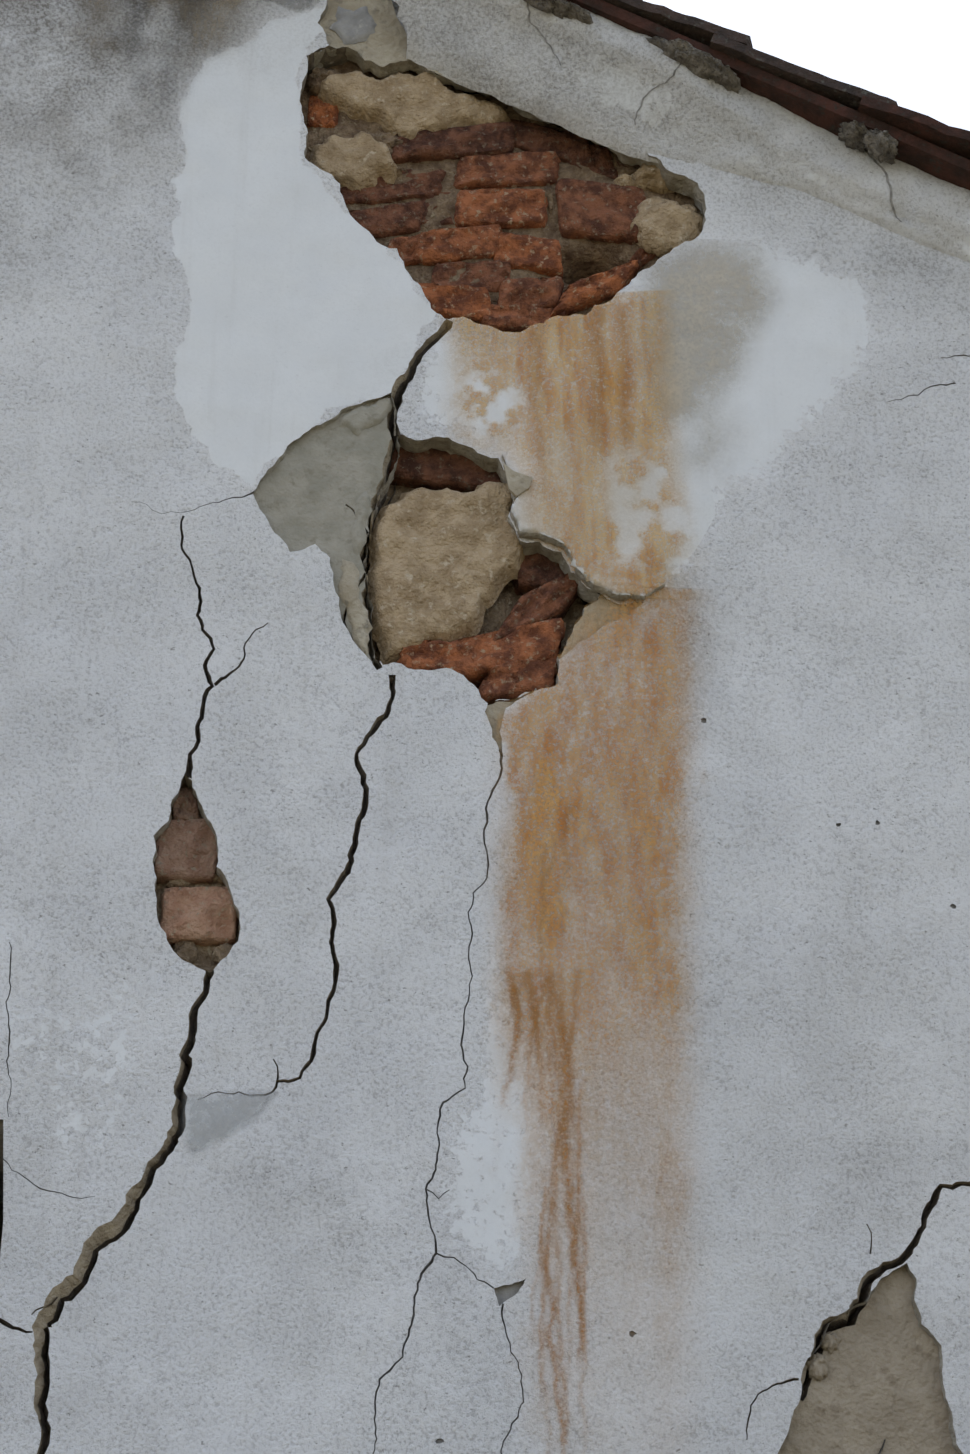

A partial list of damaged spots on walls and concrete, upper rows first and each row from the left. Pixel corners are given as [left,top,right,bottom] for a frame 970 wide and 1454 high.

flaking render [271,0,706,333]
flaking render [253,391,643,758]
flaking render [153,775,241,980]
crack [0,320,453,1454]
corrosion [458,293,683,1339]
crack [372,749,524,1454]
crack [746,1181,970,1440]
peeling [778,1263,963,1454]